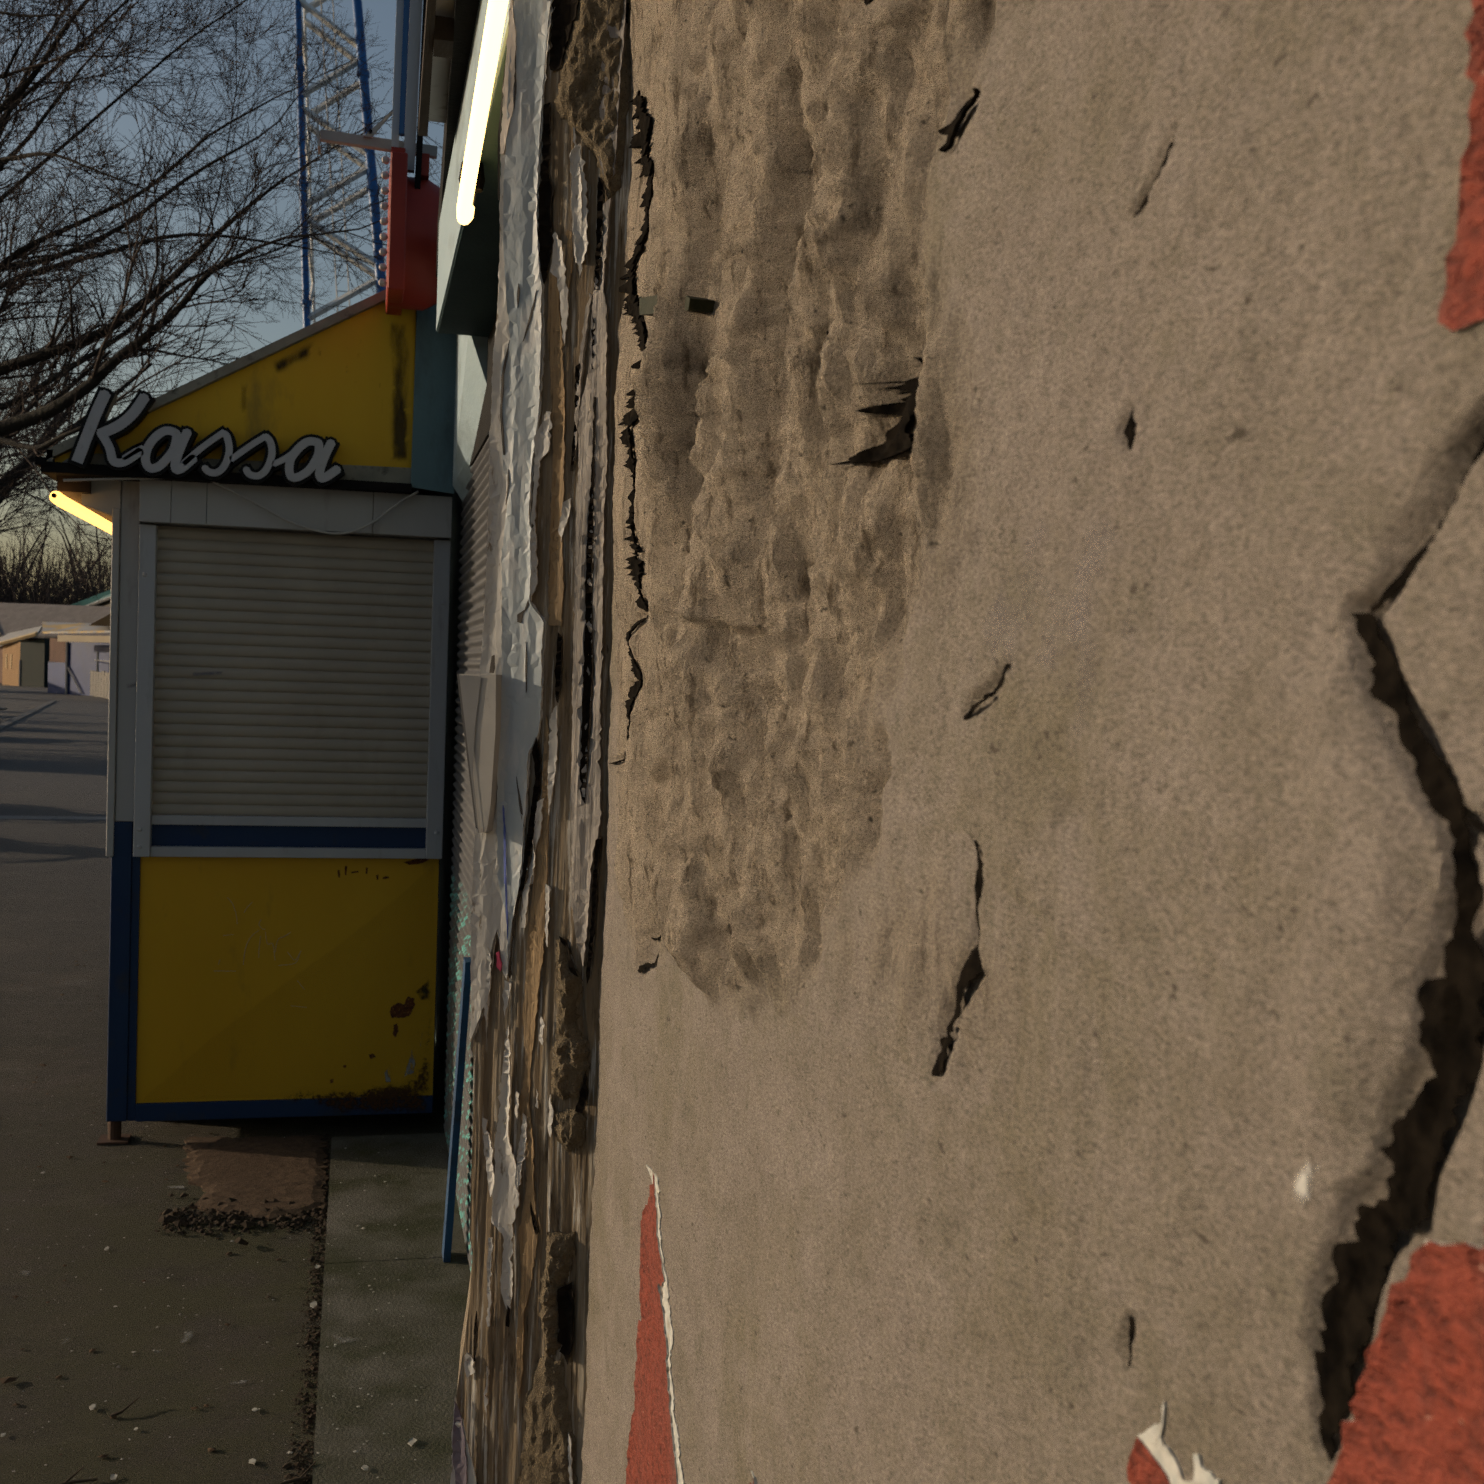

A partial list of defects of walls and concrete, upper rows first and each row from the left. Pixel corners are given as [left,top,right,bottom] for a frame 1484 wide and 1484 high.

peeling [1437,0,1484,332]
spalling [469,0,1128,1484]
corrosion [294,1041,429,1112]
corrosion [390,997,415,1037]
crack [932,840,984,1077]
crack [1314,439,1484,1463]
peeling [450,1396,477,1484]
peeling [464,1352,490,1414]
peeling [1327,1240,1484,1484]